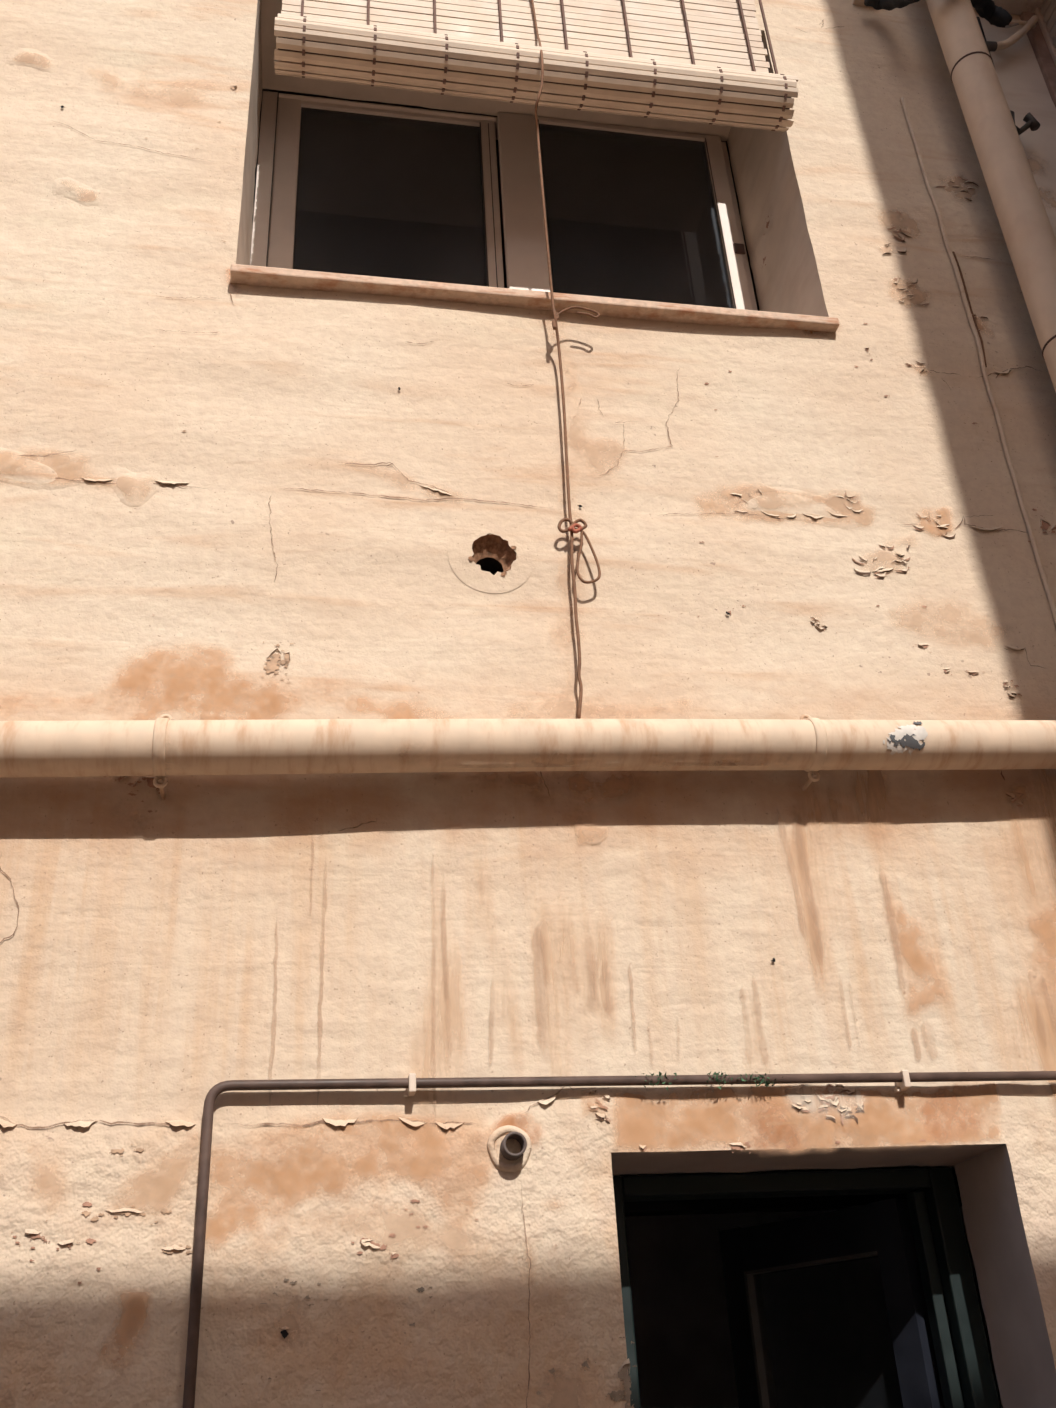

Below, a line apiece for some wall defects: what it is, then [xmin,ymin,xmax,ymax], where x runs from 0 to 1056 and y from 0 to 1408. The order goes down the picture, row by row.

crack [579,376,679,476]
crack [20,451,113,484]
crack [153,480,205,489]
peeling [261,641,294,680]
crack [0,868,19,943]
damp [898,914,942,1008]
damp [1028,994,1056,1097]
crack [0,1118,196,1129]
crack [260,1117,470,1129]
peeling [724,1142,752,1154]